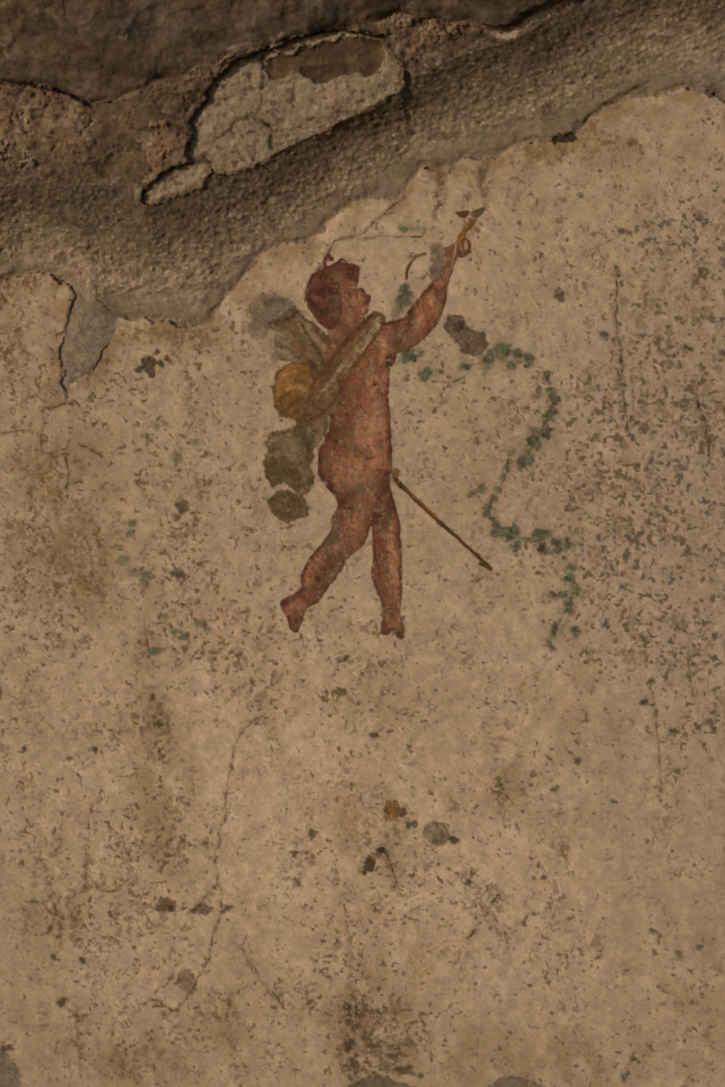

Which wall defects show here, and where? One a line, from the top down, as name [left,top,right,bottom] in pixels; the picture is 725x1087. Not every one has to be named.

spalling [704,84,717,98]
spalling [552,132,576,145]
spalling [429,245,446,280]
spalling [246,294,285,338]
spalling [444,315,487,356]
spalling [136,349,168,377]
crack [191,716,262,992]